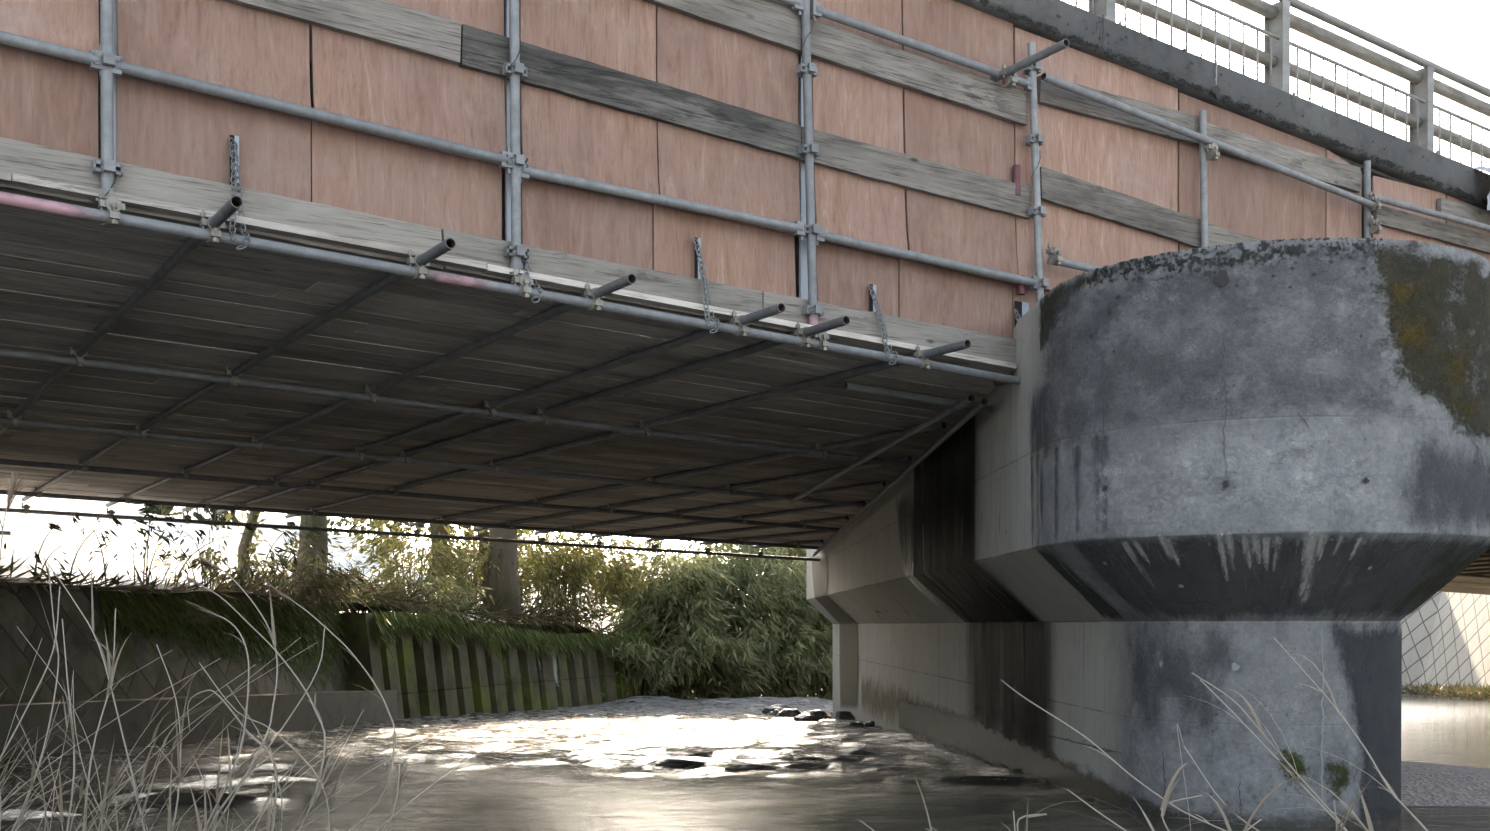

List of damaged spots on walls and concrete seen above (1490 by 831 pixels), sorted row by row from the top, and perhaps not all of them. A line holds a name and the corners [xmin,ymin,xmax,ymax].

water stain [896,252,1490,828]
crack [1221,335,1233,477]